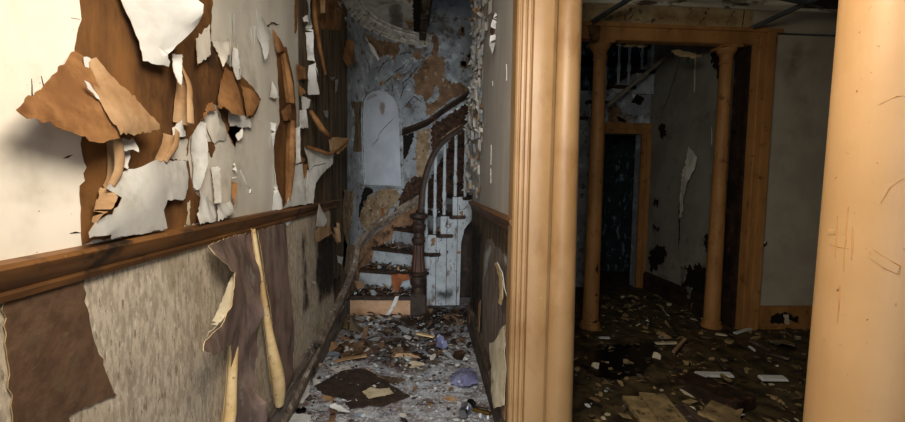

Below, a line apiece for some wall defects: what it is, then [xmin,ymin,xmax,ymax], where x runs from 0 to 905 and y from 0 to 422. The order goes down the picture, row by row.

peeling [74,0,261,245]
spalling [337,0,401,61]
spalling [359,187,400,237]
peeling [403,0,492,199]